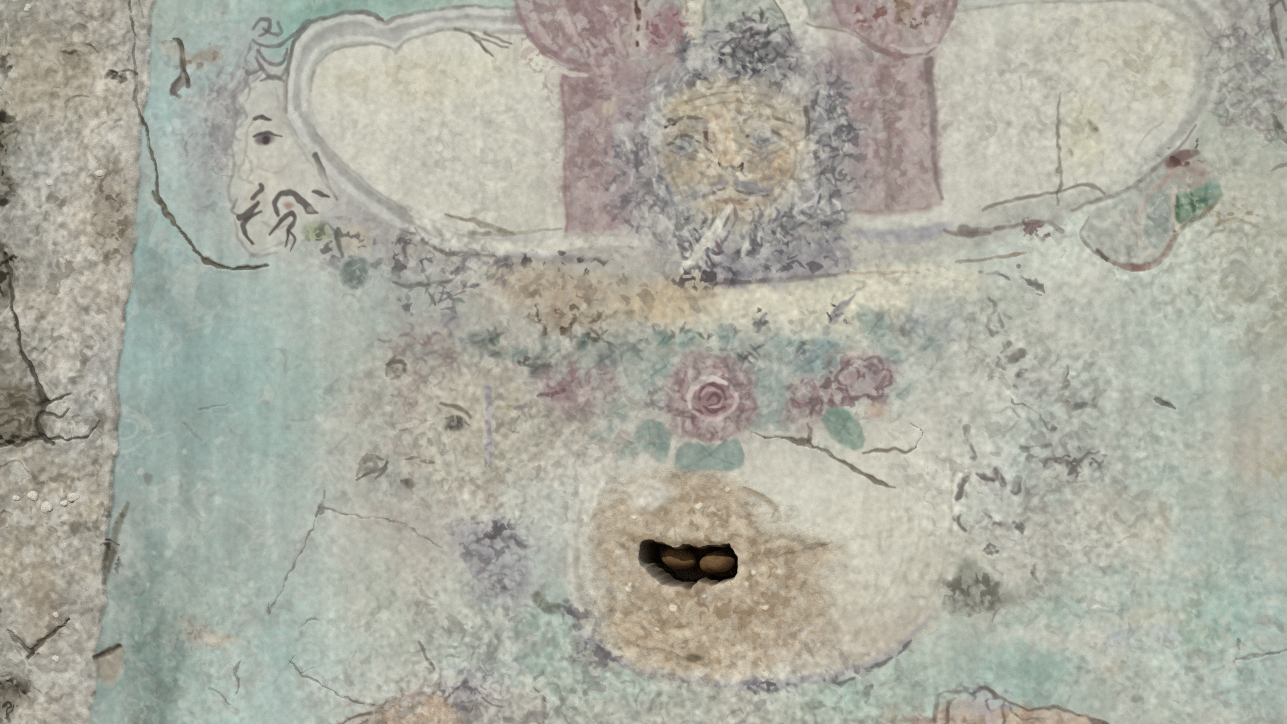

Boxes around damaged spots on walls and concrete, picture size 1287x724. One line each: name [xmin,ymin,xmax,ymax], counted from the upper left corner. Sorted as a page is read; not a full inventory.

crack [128,0,136,37]
crack [138,111,159,181]
crack [174,220,269,270]
crack [0,303,100,448]
crack [755,423,923,488]
crack [267,490,443,615]
spalling [577,462,849,692]
crack [208,661,241,705]
crack [288,618,382,707]
spalling [373,687,470,724]
crack [1233,638,1285,665]